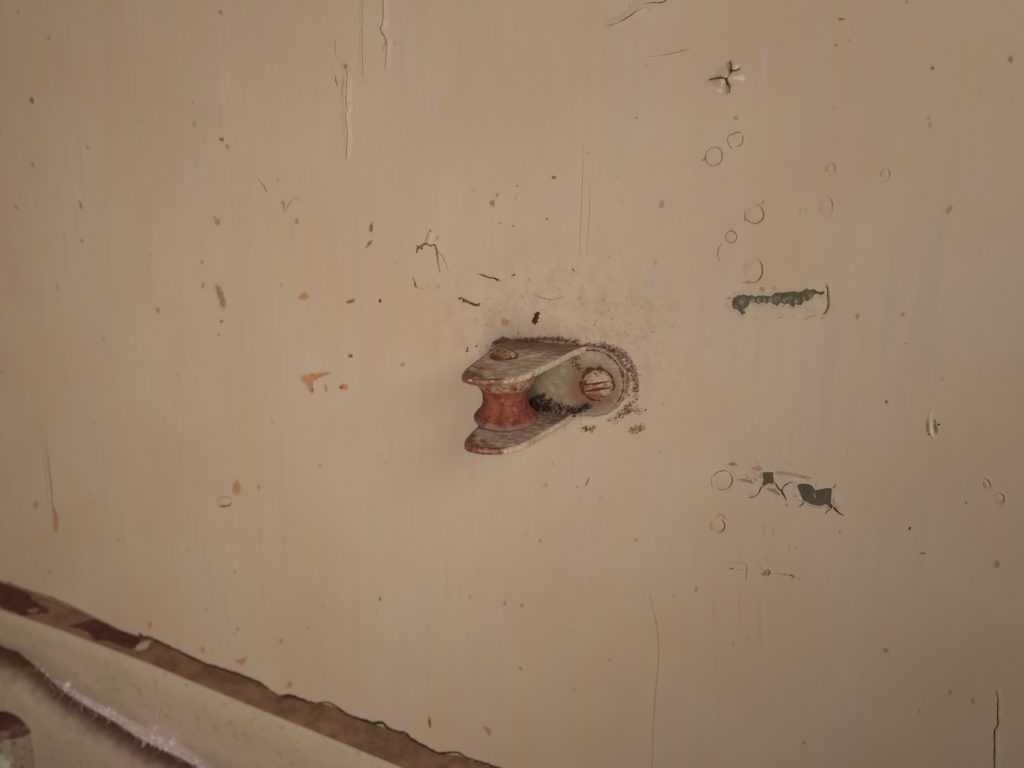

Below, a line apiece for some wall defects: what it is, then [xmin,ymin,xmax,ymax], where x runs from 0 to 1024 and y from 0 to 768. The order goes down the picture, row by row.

crack [709,61,745,93]
peeling [724,282,836,321]
corrosion [489,320,519,361]
corrosion [579,367,615,401]
peeling [745,457,845,516]
peeling [0,583,49,617]
peeling [67,619,156,653]